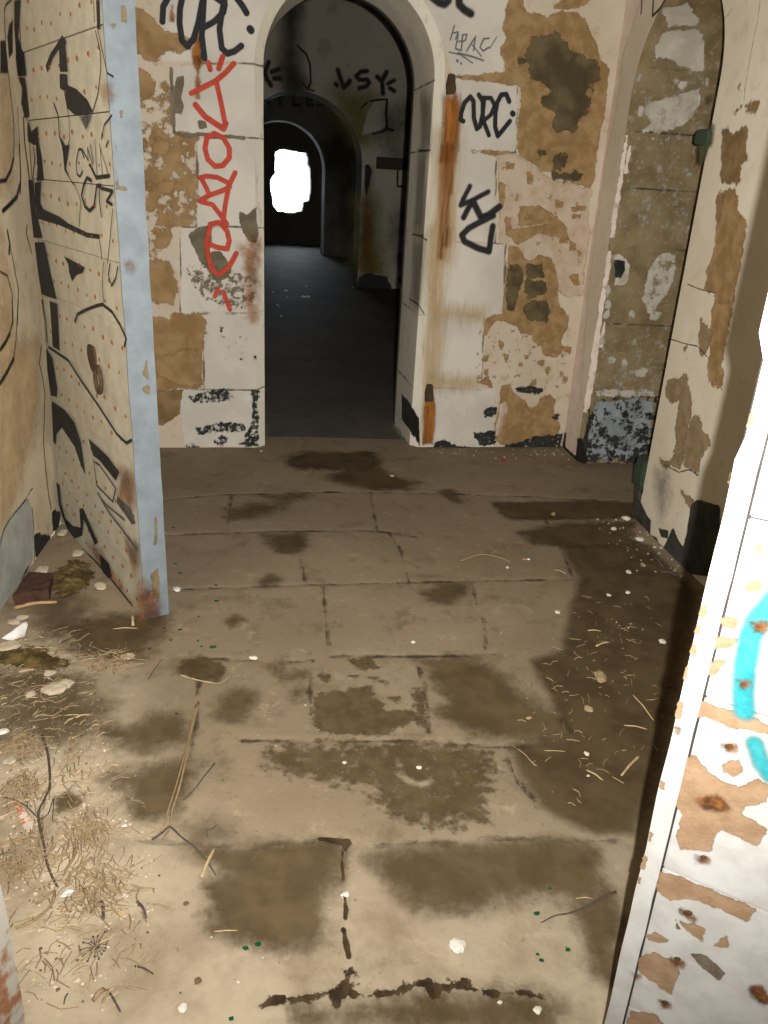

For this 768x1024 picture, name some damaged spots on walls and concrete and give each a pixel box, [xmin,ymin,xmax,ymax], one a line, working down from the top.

peeling [111,5,259,426]
corrosion [430,94,470,386]
peeling [434,0,711,476]
peeling [683,126,748,390]
water stain [288,451,413,490]
corrosion [423,399,435,445]
water stain [261,501,694,984]
corrosion [699,796,729,811]
peeling [676,755,768,852]
water stain [205,841,344,950]
peeling [656,872,756,922]
corrosion [749,986,768,1004]